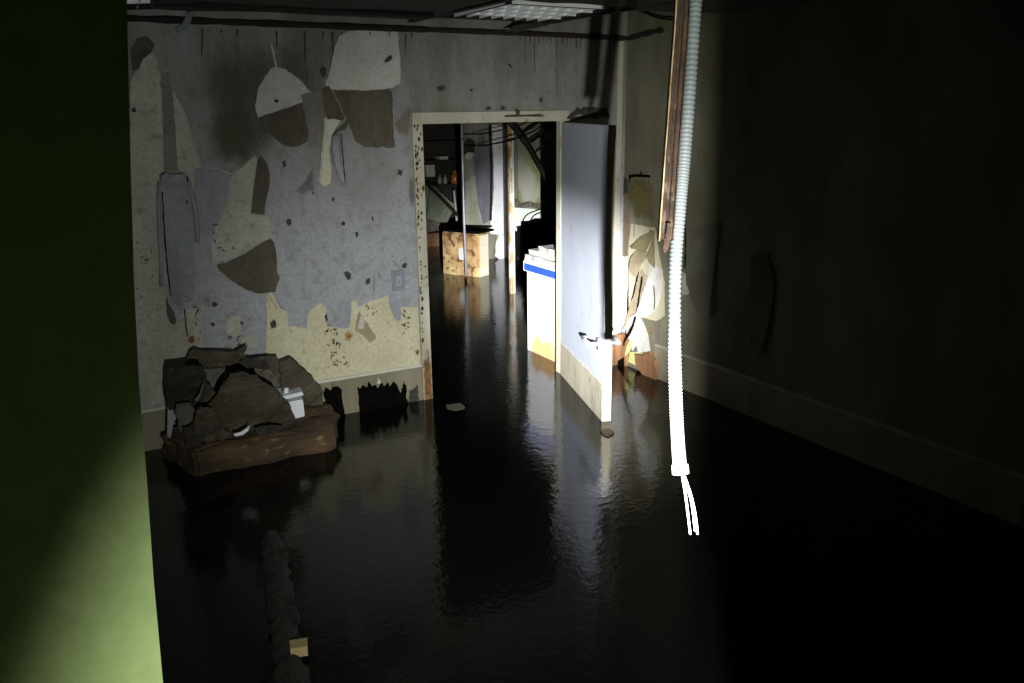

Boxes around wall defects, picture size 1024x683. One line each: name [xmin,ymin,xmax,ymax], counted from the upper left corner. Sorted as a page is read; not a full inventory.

water stain [215,60,270,158]
peeling [130,30,427,407]
peeling [621,224,665,366]
rust [416,350,432,400]